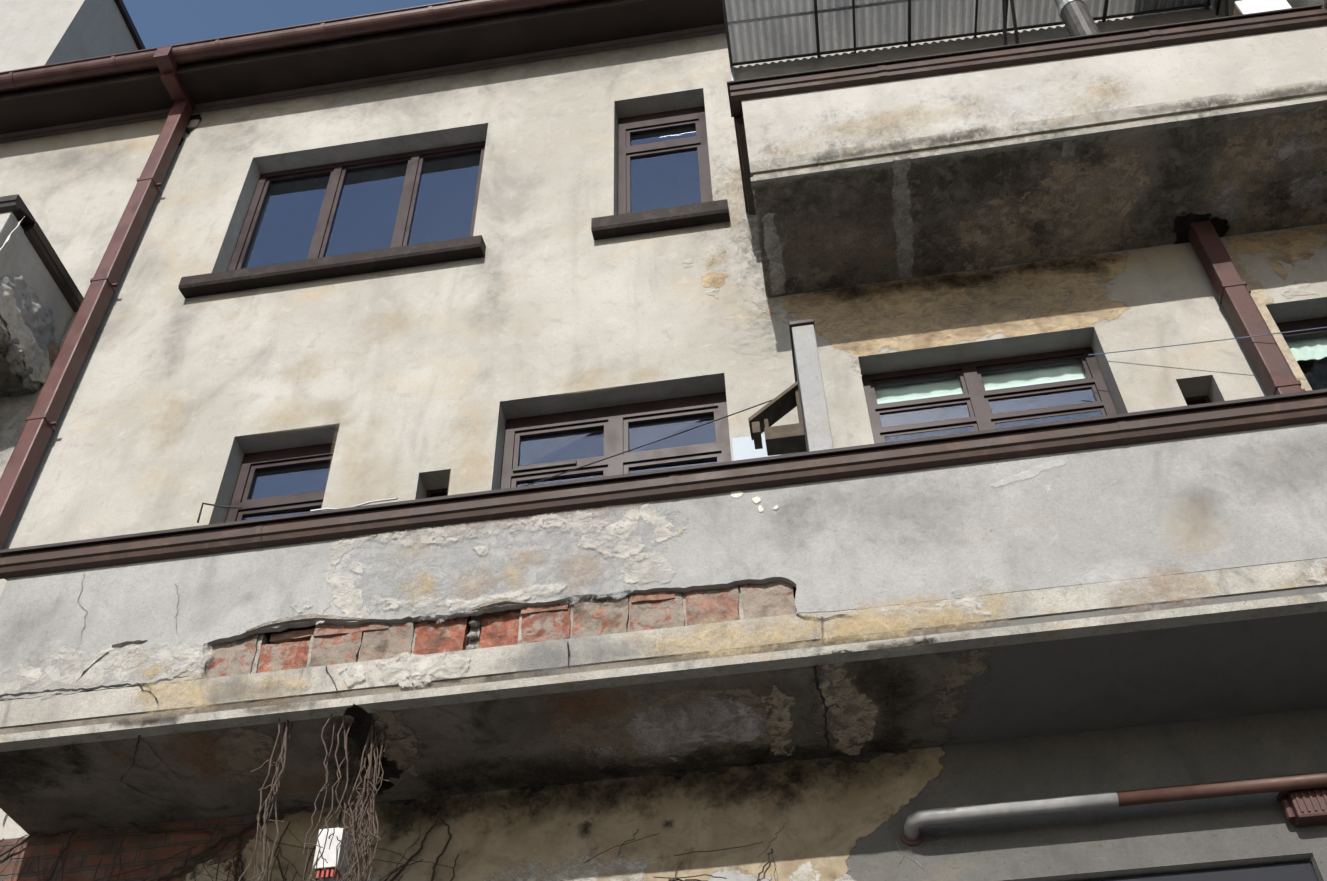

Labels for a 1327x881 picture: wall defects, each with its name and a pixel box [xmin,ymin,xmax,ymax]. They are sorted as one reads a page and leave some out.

peeling [1182,84,1327,109]
spalling [0,275,60,397]
damp [743,125,1075,295]
peeling [1173,182,1327,391]
peeling [731,491,778,512]
crack [0,574,194,802]
flaking render [0,502,796,698]
flaking render [0,635,990,881]
damp [372,596,1002,840]